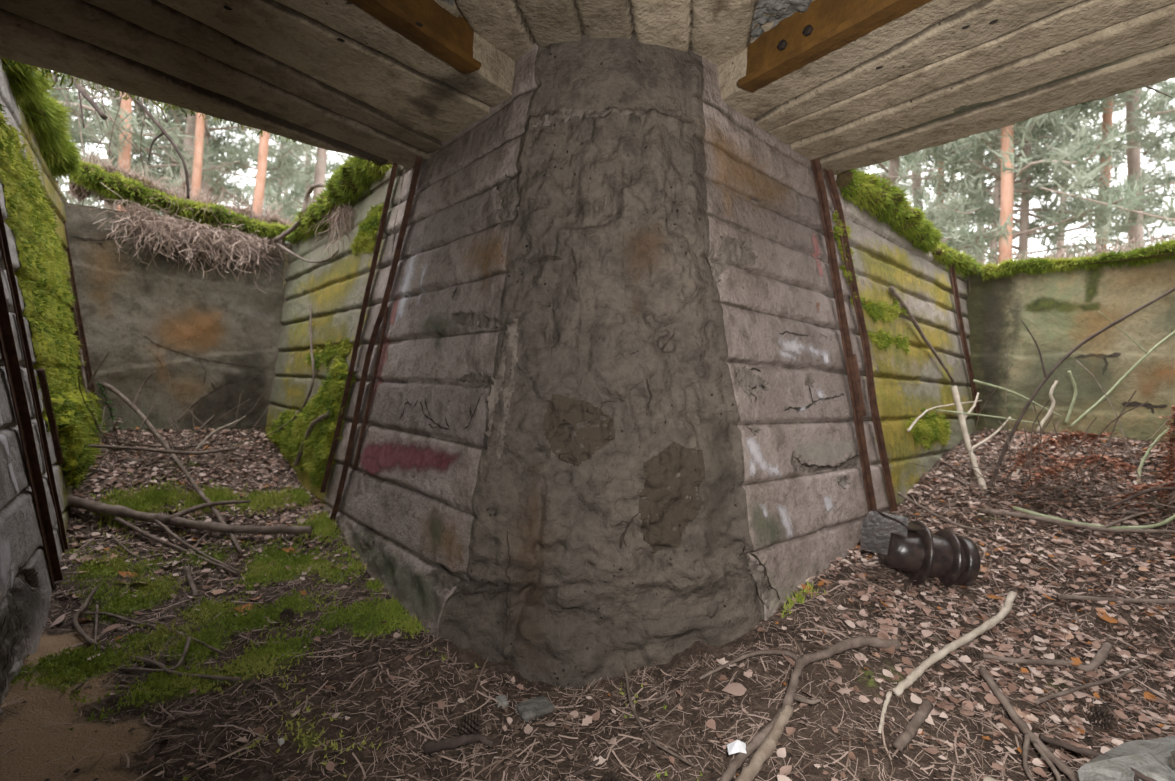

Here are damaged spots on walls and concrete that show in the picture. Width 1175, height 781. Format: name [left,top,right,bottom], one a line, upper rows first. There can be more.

spalling [751,0,812,40]
crack [748,368,767,401]
crack [784,387,845,412]
crack [793,453,860,469]